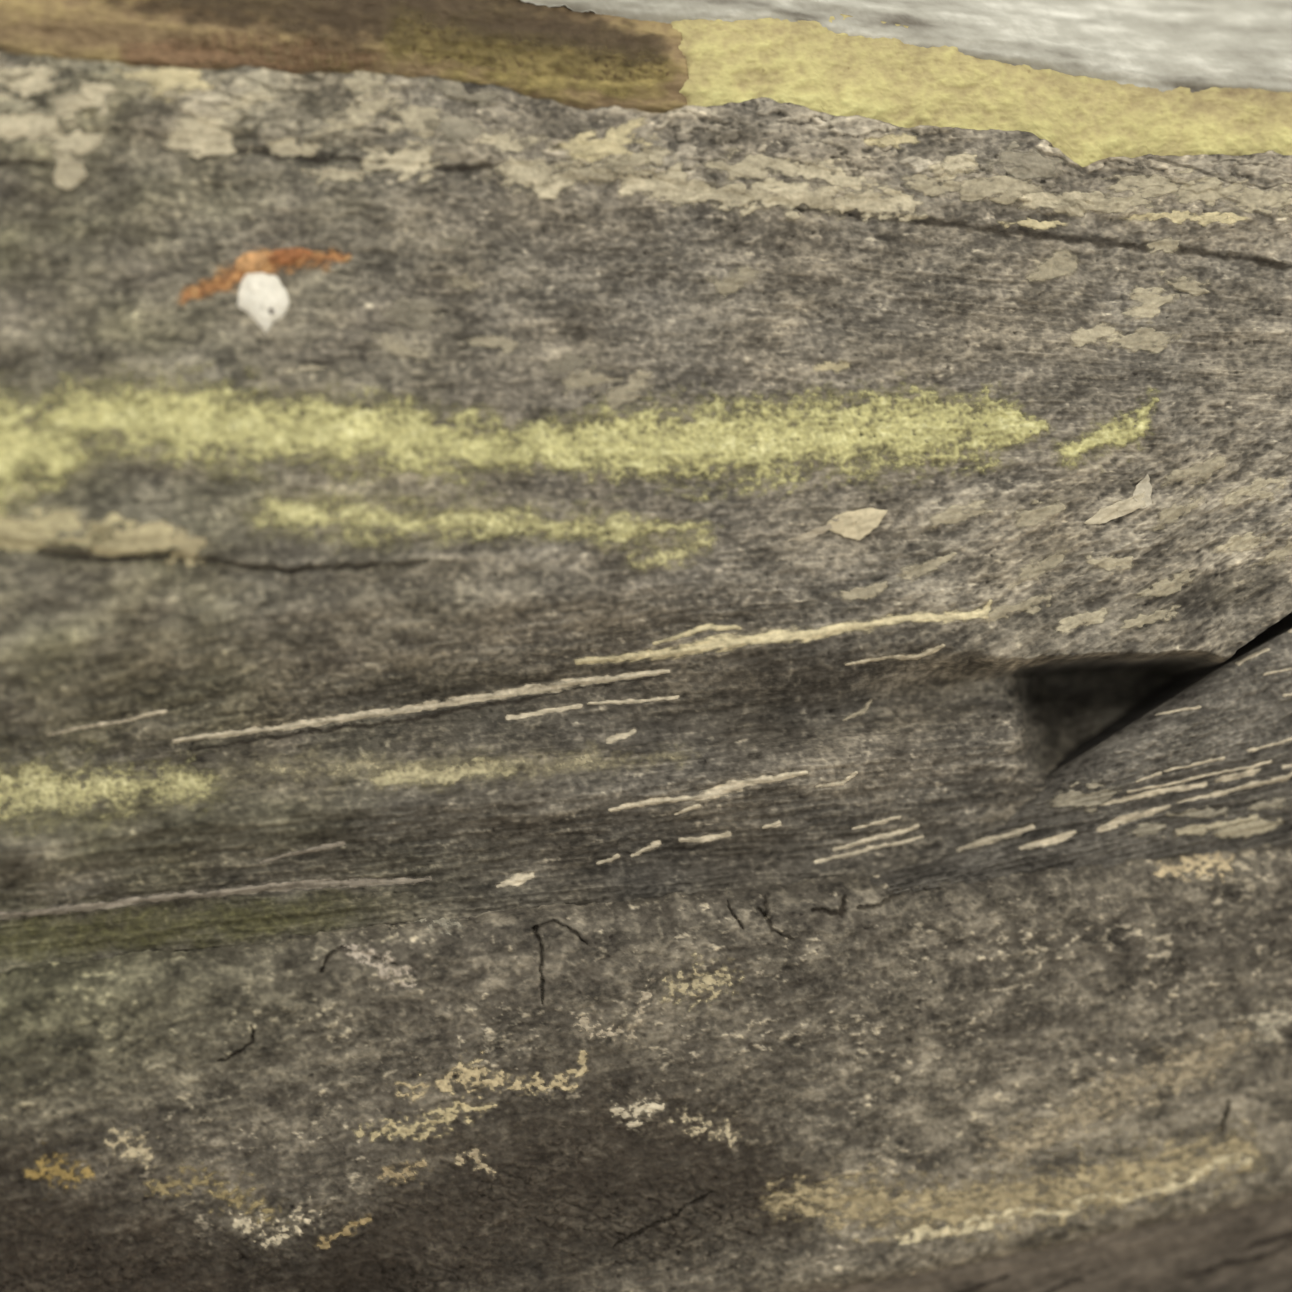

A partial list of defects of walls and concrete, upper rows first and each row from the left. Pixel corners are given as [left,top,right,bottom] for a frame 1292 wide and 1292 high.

corrosion [180,248,351,304]